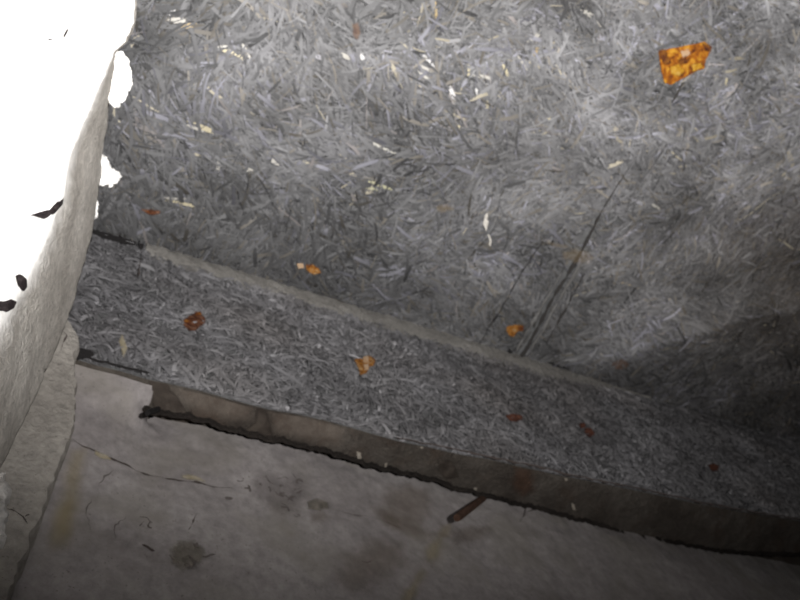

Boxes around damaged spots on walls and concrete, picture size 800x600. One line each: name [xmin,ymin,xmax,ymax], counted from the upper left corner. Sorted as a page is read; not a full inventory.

rust [659,42,712,85]
rust [183,312,206,331]
rust [506,325,524,337]
rust [354,356,375,375]
crack [74,440,230,530]